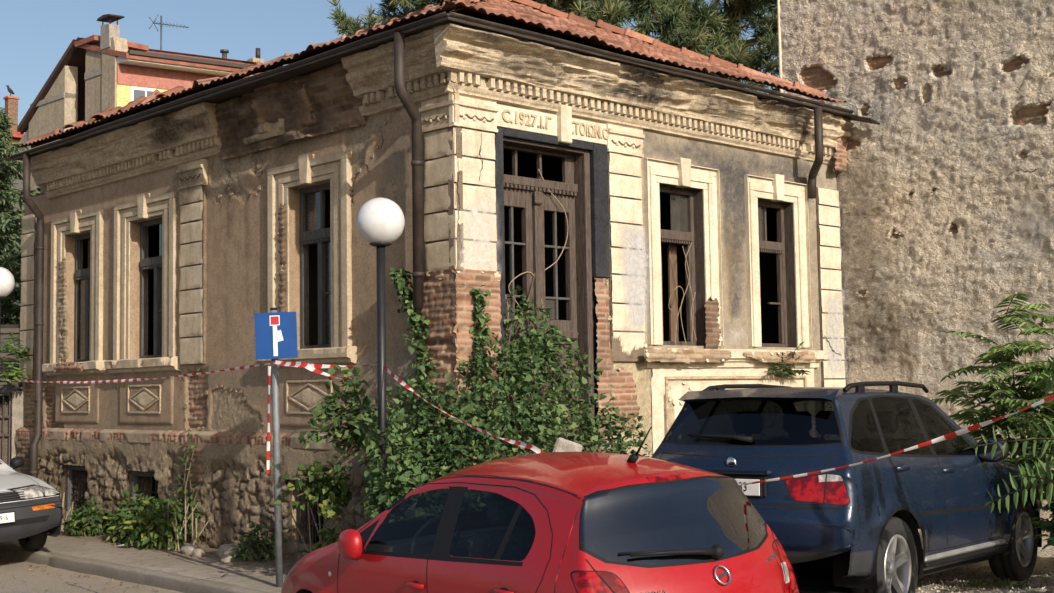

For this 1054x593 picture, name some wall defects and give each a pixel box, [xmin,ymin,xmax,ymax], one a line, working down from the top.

spalling [862,53,893,74]
spalling [1001,53,1031,72]
spalling [800,65,839,91]
spalling [893,76,907,90]
spalling [918,62,951,105]
spalling [1013,100,1050,126]
flaking render [276,203,287,312]
flaking render [421,269,502,467]
flaking render [594,277,817,458]